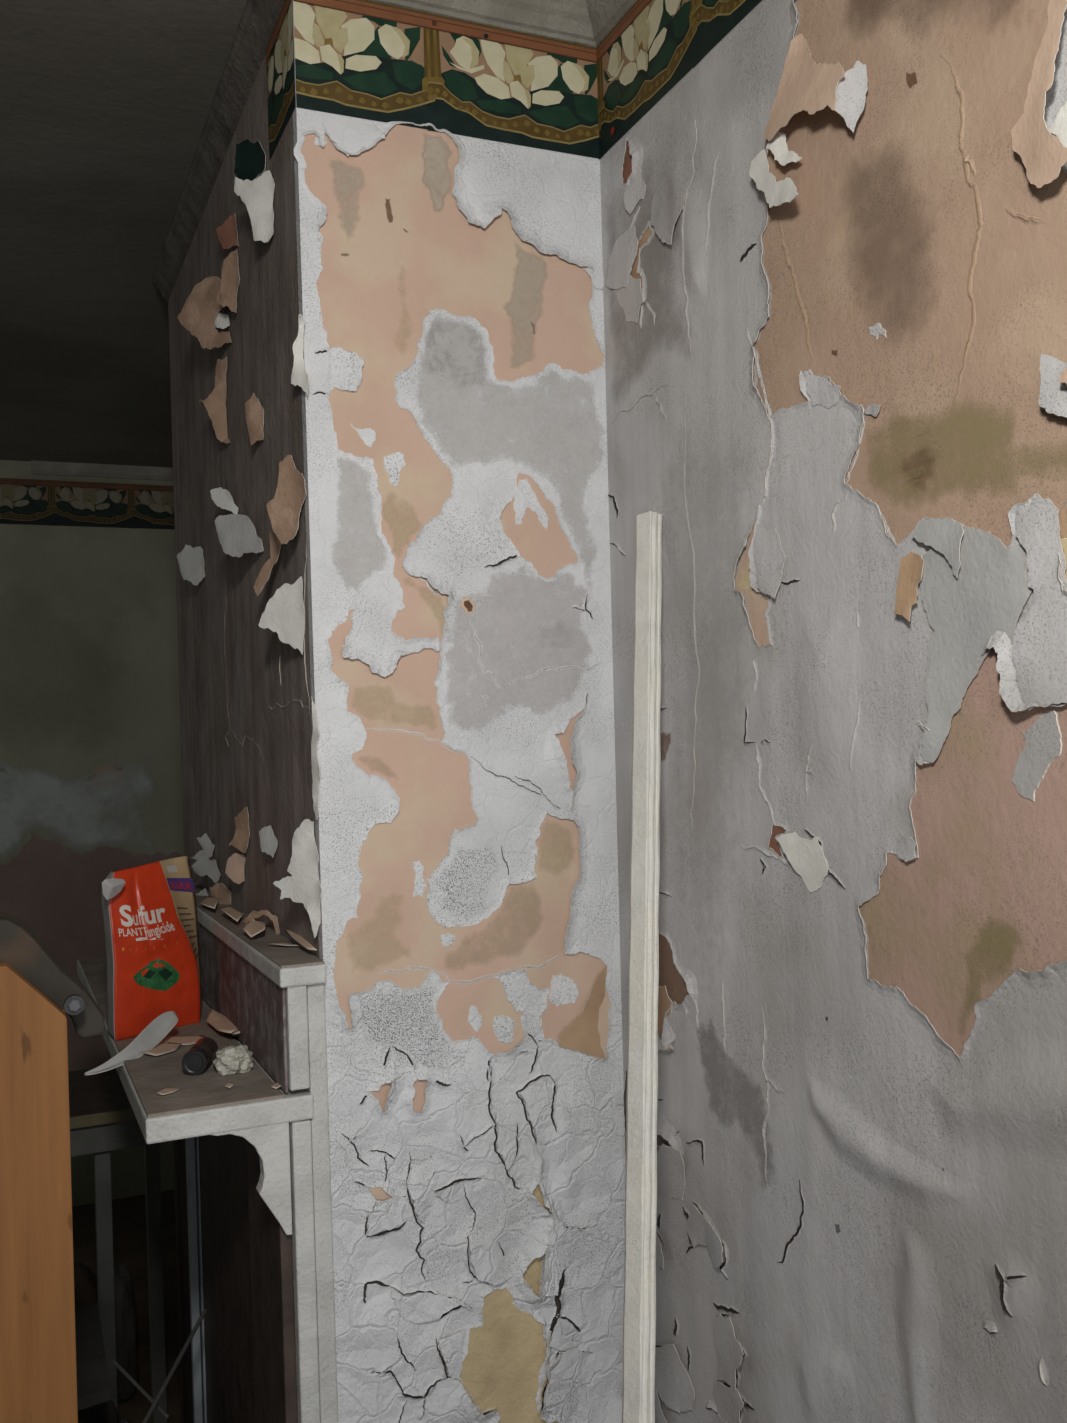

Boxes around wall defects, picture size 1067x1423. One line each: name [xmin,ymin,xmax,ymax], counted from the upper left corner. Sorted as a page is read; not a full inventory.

peeling [0,116,652,1064]
peeling [736,0,1067,1057]
leakage [0,765,153,855]
peeling [66,1008,240,1076]
crack [341,1011,593,1423]
peeling [448,1151,571,1423]
peeling [659,934,689,1005]
crack [658,1095,706,1167]
crack [673,982,727,1052]
crack [655,1200,754,1423]
crack [760,1006,806,1265]